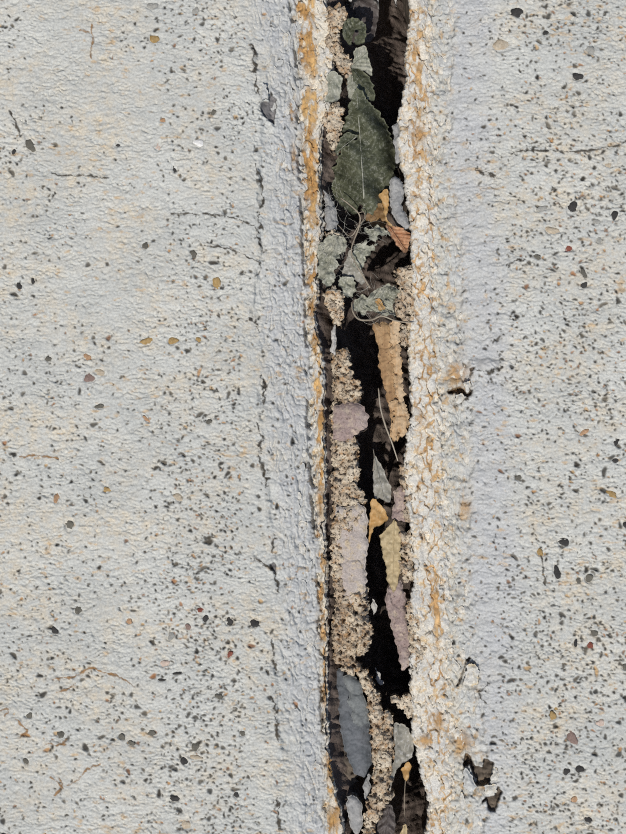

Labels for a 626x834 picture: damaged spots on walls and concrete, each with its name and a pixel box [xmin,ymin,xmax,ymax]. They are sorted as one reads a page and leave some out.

crack [313,0,431,834]
spalling [396,0,499,834]